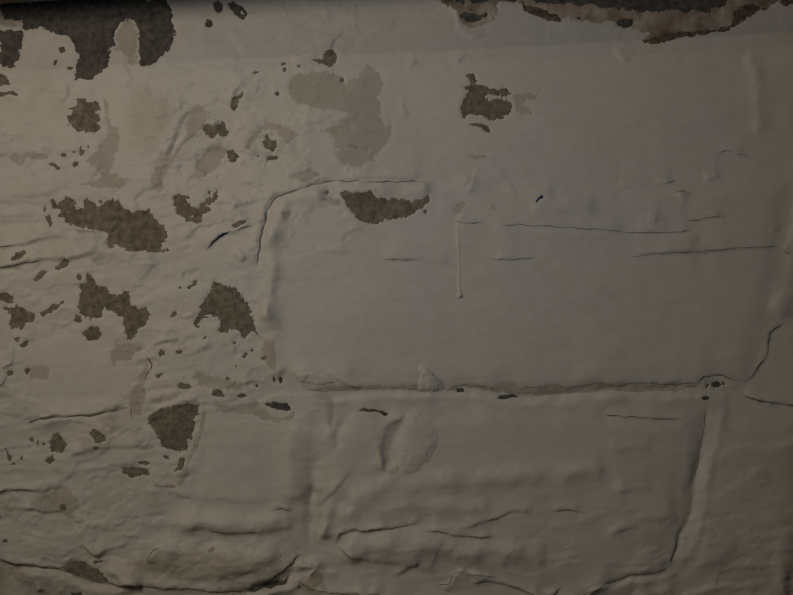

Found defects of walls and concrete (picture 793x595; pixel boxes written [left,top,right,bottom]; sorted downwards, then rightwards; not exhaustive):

flaking render [0,0,177,86]
flaking render [43,196,170,253]
crack [257,180,423,262]
flaking render [340,190,430,225]
crack [500,216,719,233]
flaking render [73,273,150,341]
flaking render [193,281,258,344]
crack [519,325,793,406]
flaking render [148,402,200,472]
crack [0,559,58,569]
crack [111,555,349,595]
crack [335,524,410,562]